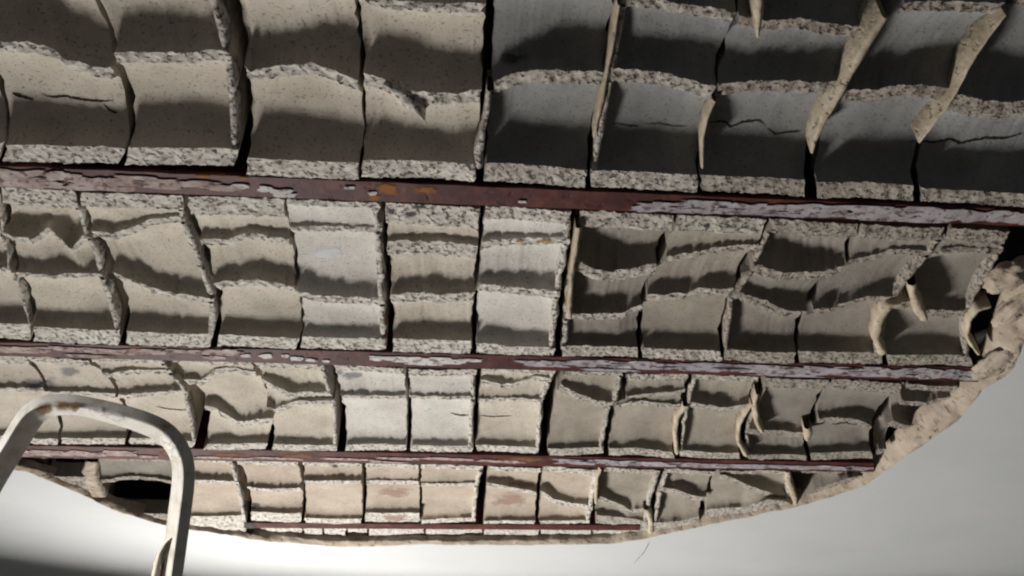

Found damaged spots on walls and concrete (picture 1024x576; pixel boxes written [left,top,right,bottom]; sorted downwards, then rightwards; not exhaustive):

crack [12,93,117,113]
crack [711,120,800,135]
crack [923,133,1022,144]
peeling [0,169,297,198]
rust [369,184,396,200]
peeling [629,200,1024,231]
peeling [0,346,330,363]
flaking render [162,284,1024,547]
flaking render [14,450,167,526]